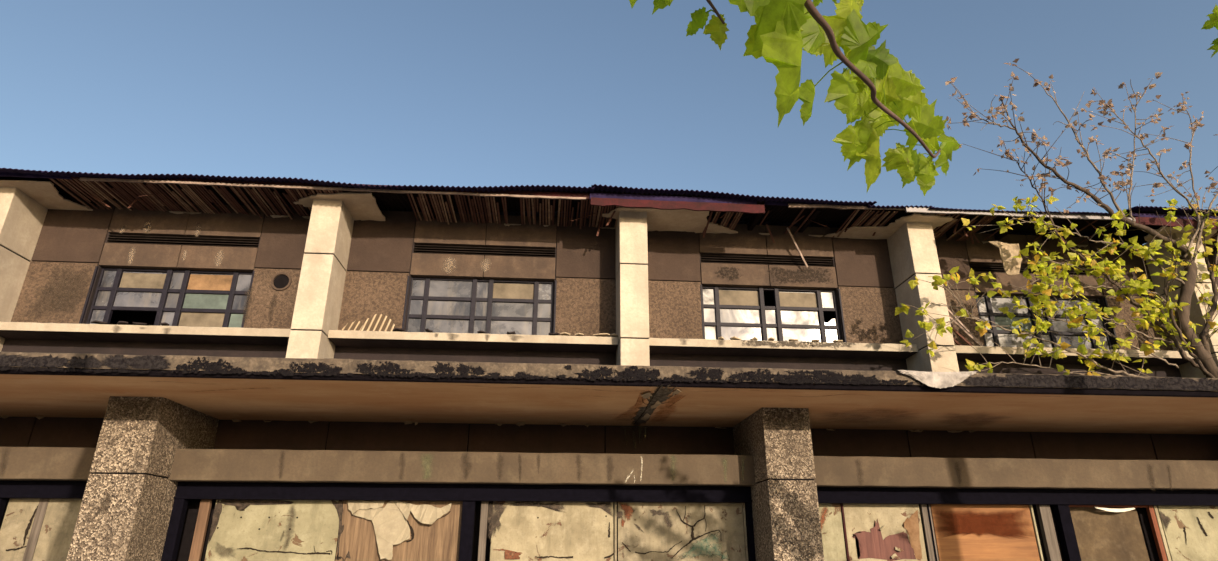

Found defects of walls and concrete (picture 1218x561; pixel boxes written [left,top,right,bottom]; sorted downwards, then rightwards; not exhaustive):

leakage [741,340,855,350]
leakage [0,354,926,386]
leakage [961,374,1218,391]
spalling [631,384,681,426]